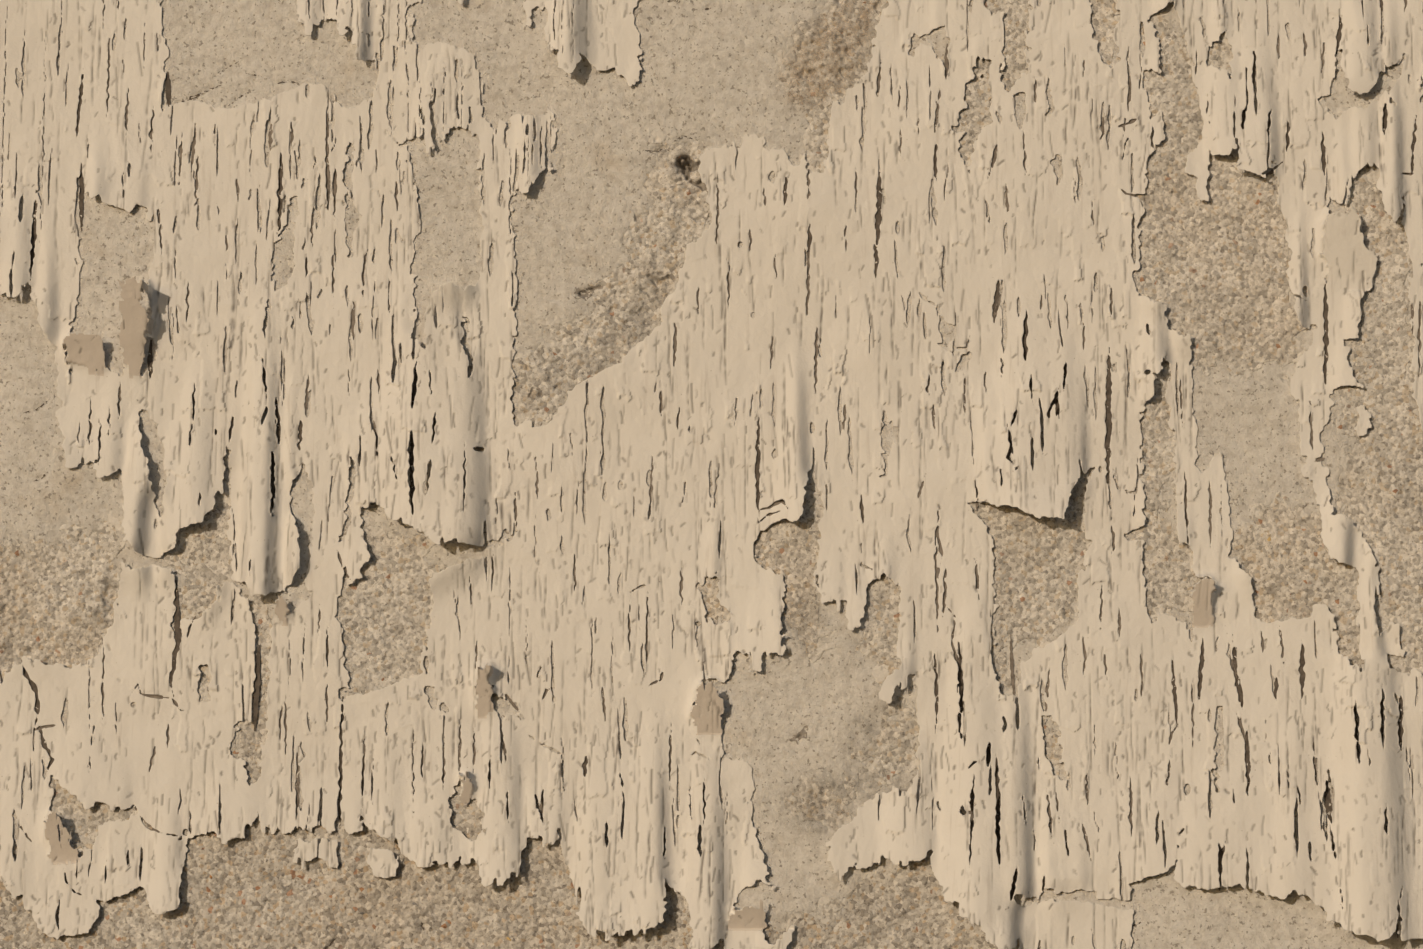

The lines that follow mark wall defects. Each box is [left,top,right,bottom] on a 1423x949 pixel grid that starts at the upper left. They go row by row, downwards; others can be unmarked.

peeling [523,0,643,87]
spalling [1134,6,1309,383]
spalling [510,129,713,427]
peeling [1320,207,1378,292]
spalling [1336,165,1423,676]
peeling [377,444,485,546]
peeling [981,439,1084,519]
peeling [205,800,274,845]
spalling [0,803,693,949]
spalling [761,854,998,949]
peeling [942,833,1134,949]
peeling [1316,840,1423,942]